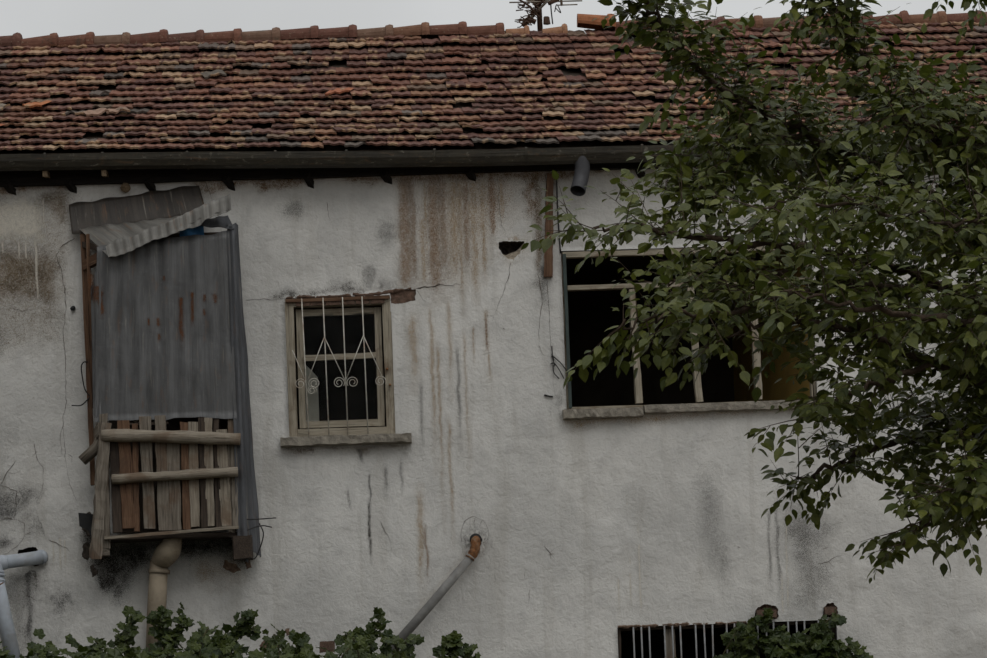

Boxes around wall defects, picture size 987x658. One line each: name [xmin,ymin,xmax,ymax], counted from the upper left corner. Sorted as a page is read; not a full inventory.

water stain [190,179,303,196]
water stain [0,186,80,353]
flaking render [286,287,416,304]
water stain [273,171,574,306]
spalling [499,241,524,260]
crack [1,238,75,555]
water stain [407,303,491,530]
flaking render [82,528,98,577]
water stain [84,530,162,606]
water stain [767,491,834,614]
water stain [5,570,74,654]